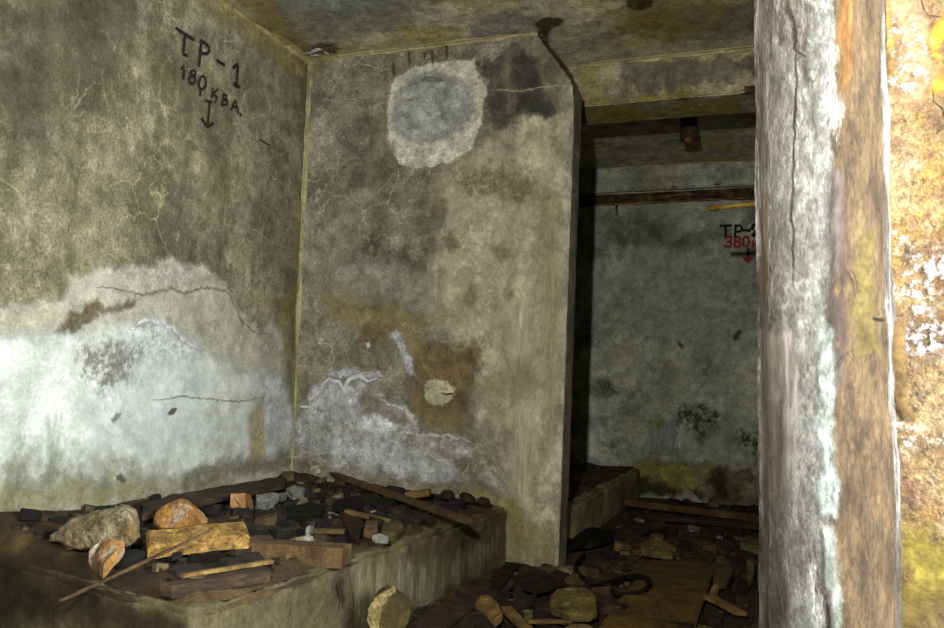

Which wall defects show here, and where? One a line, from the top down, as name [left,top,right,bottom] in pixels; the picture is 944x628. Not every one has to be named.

leakage [471,11,564,129]
leakage [890,20,923,90]
rust [886,0,944,103]
crack [784,0,811,289]
leakage [0,256,472,512]
rust [329,296,481,426]
leakage [894,255,944,356]